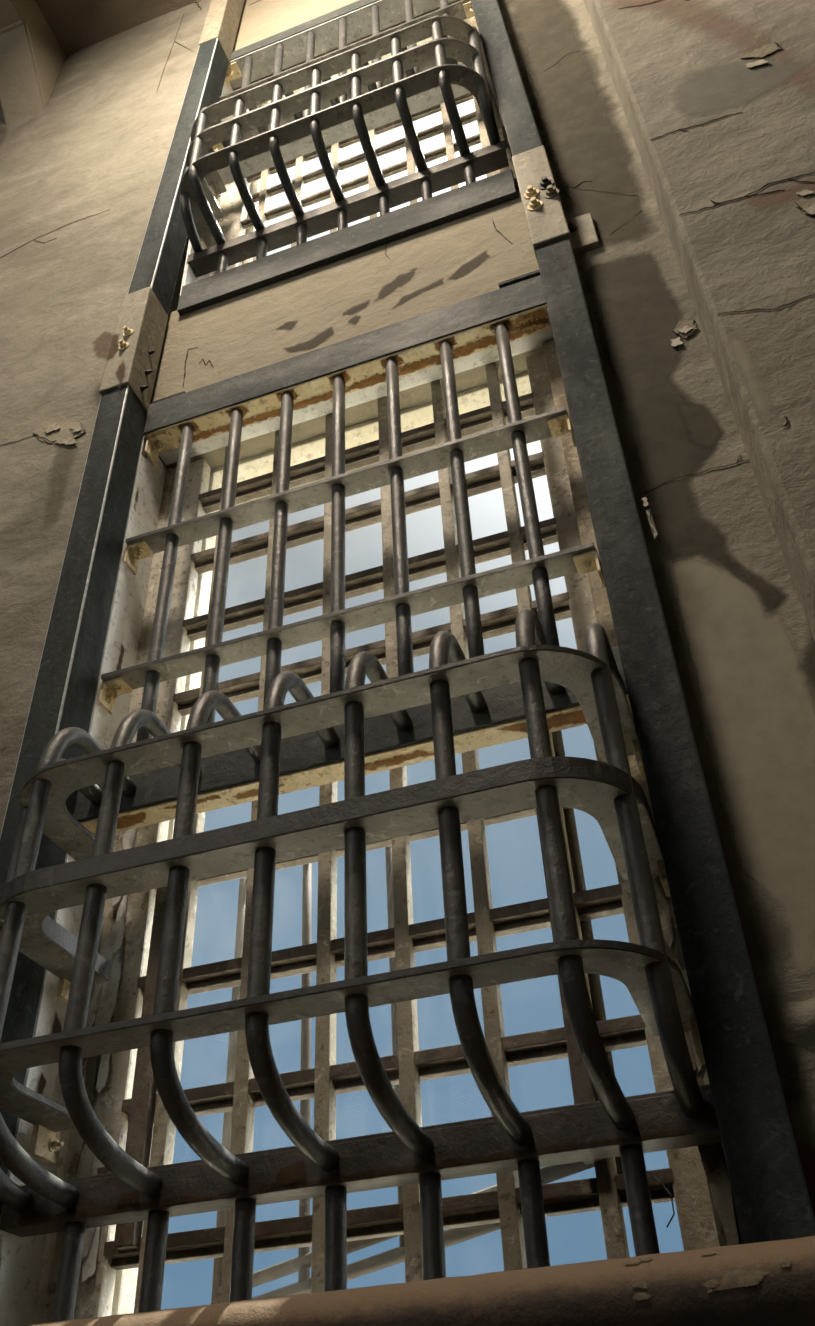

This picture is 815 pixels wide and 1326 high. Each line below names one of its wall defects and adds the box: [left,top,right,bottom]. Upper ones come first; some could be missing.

crack [651,112,742,140]
crack [679,171,815,216]
spalling [795,190,815,216]
spalling [670,319,698,347]